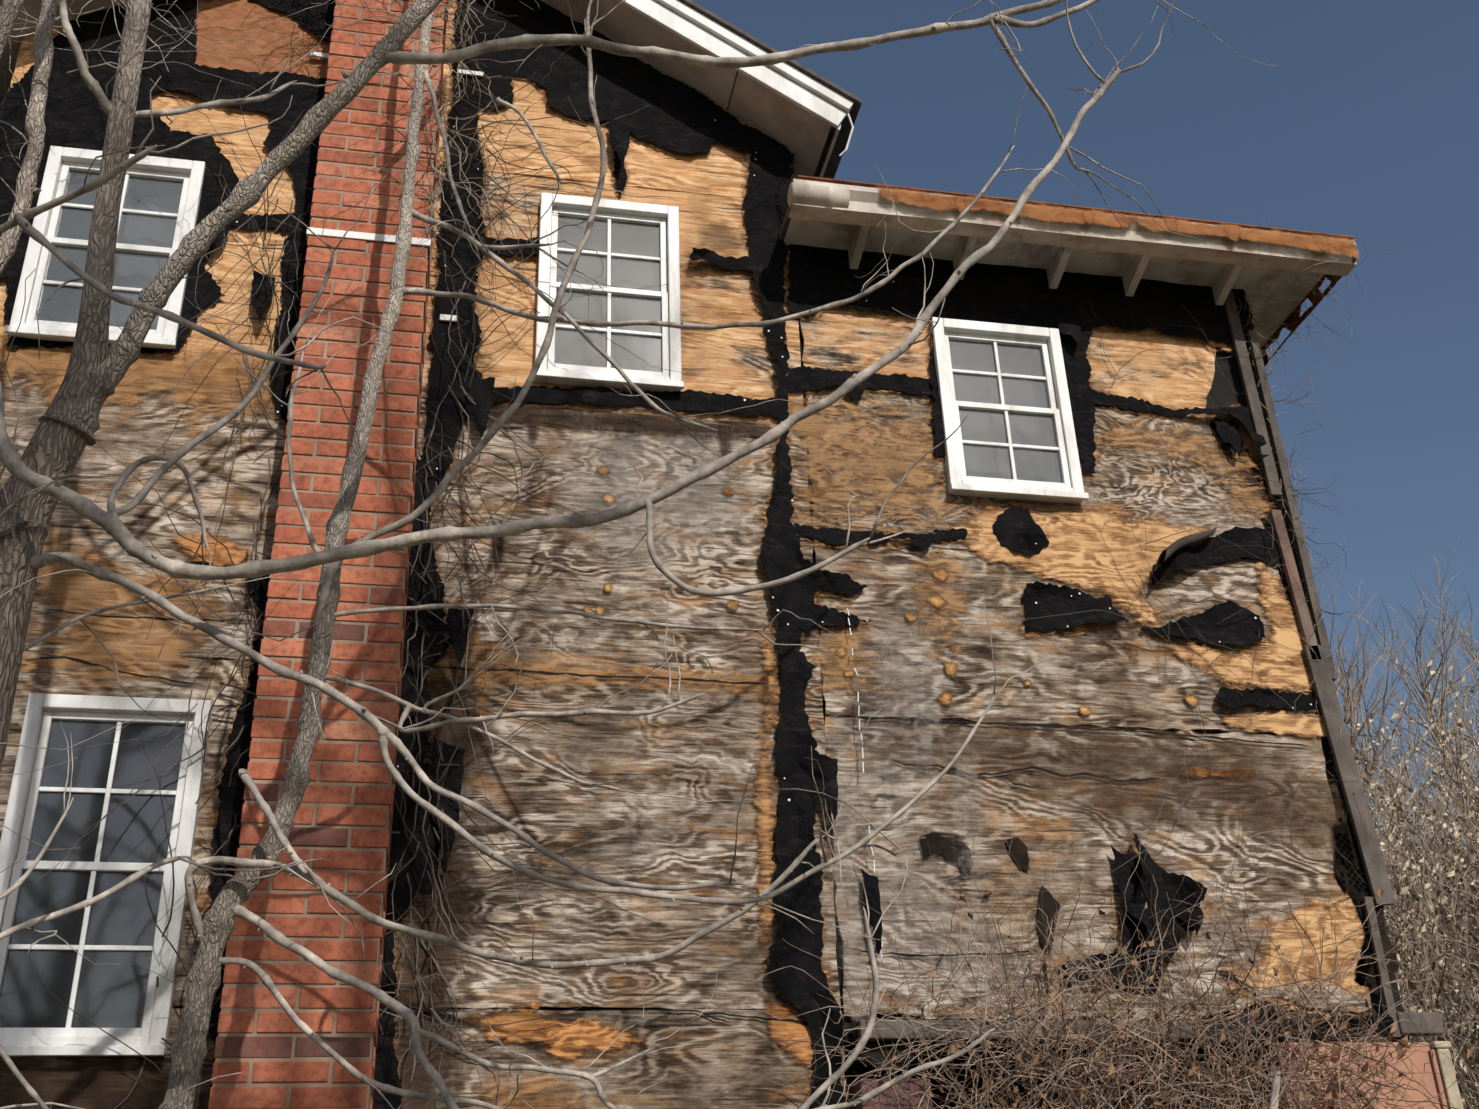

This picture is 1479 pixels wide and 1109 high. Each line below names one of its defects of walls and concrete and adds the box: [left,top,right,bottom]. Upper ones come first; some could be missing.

water stain [486,403,770,456]
water stain [492,522,504,565]
peeling [950,506,983,537]
peeling [1186,643,1215,674]
water stain [423,668,494,797]
water stain [856,721,1355,863]
water stain [395,818,485,1109]
water stain [483,1074,582,1109]